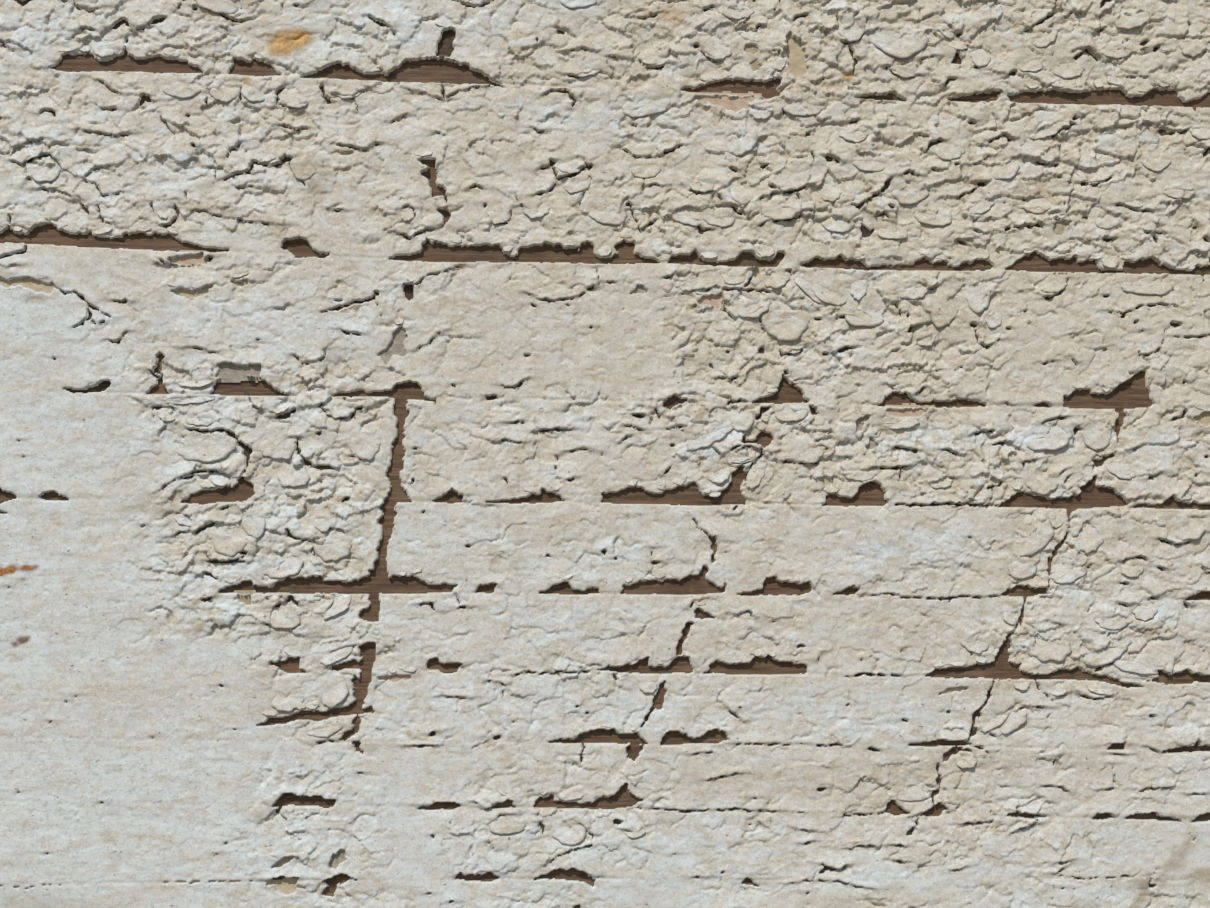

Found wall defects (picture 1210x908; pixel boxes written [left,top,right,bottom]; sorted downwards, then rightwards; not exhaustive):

rust [270,30,310,55]
peeling [0,142,229,299]
crack [60,290,110,327]
peeling [147,348,465,629]
crack [1047,413,1126,576]
rust [0,565,37,576]
peeling [621,552,812,607]
crack [883,593,991,602]
crack [1016,601,1026,627]
peeling [909,371,1210,769]
peeling [600,645,807,693]
crack [906,688,991,835]